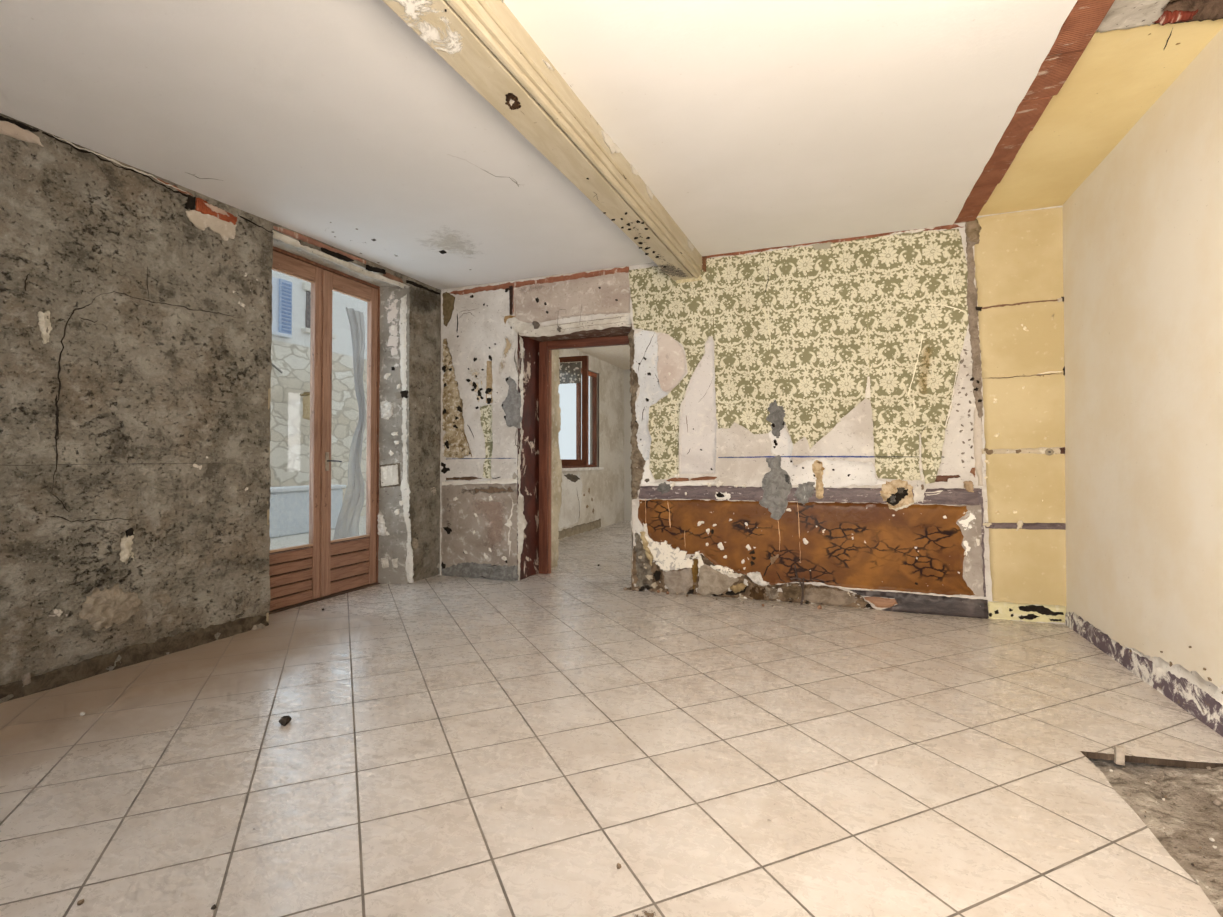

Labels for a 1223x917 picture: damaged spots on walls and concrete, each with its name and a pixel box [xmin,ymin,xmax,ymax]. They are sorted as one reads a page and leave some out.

spalling [1152,0,1223,26]
spalling [0,116,44,147]
spalling [184,195,237,241]
flaking render [272,226,631,389]
crack [51,267,240,522]
flaking render [628,329,668,500]
peeling [558,472,594,529]
spalling [715,492,731,500]
spalling [880,479,914,516]
spalling [627,519,875,609]
crack [763,554,786,583]
peeling [1124,644,1223,706]